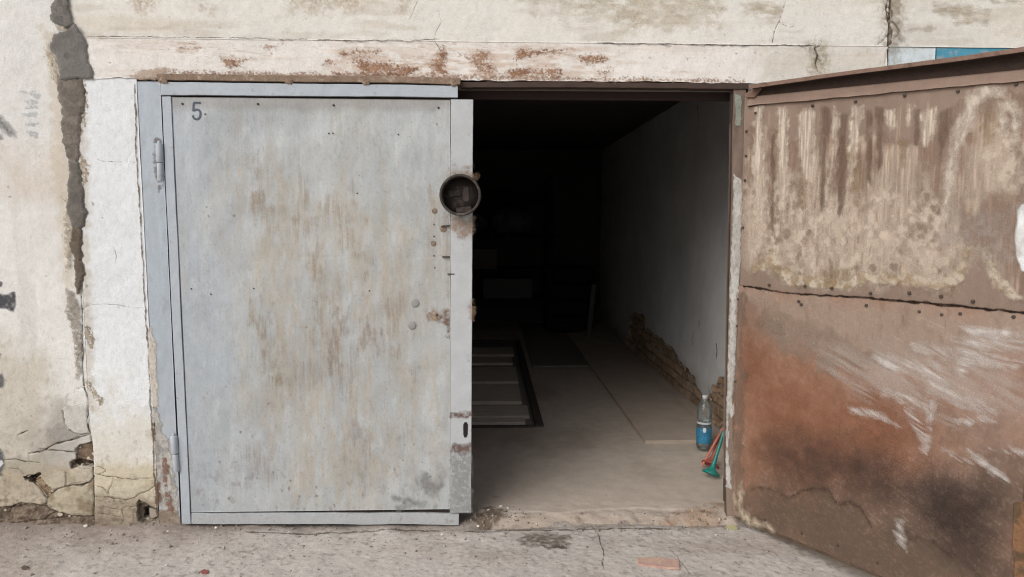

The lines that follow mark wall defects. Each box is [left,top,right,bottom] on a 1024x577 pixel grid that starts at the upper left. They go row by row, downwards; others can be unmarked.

corrosion [170,45,652,82]
water stain [743,84,1024,299]
crack [4,85,158,520]
peeling [137,327,179,524]
corrosion [451,443,472,455]
spalling [623,174,743,490]